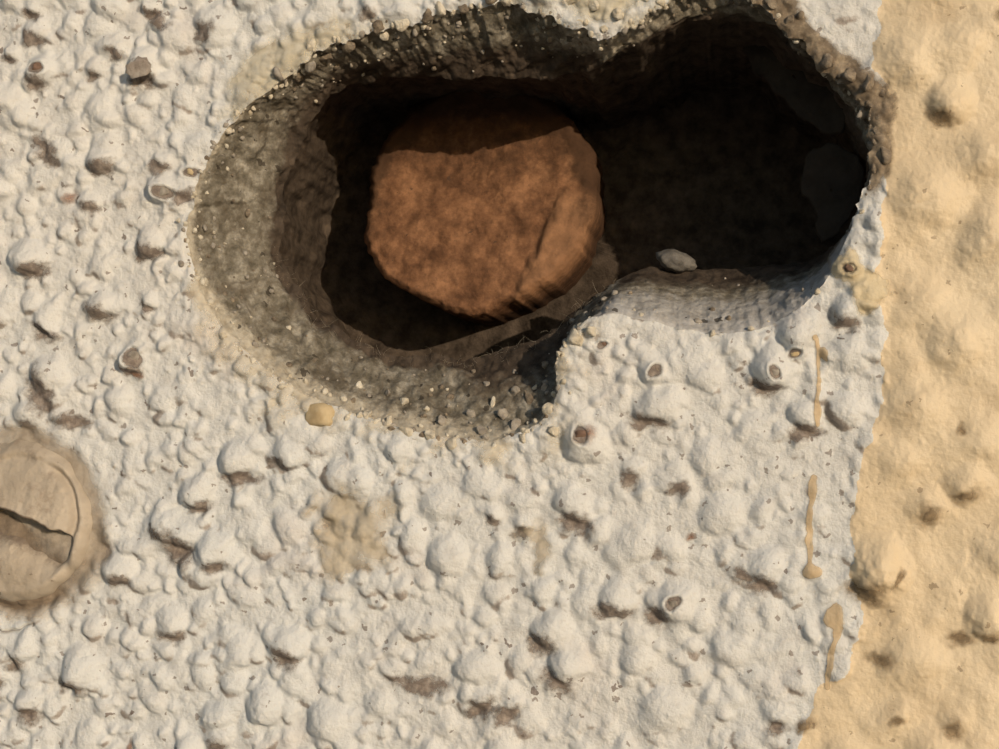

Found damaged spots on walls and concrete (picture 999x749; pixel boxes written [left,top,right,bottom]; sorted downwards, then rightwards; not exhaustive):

spalling [148,0,892,450]